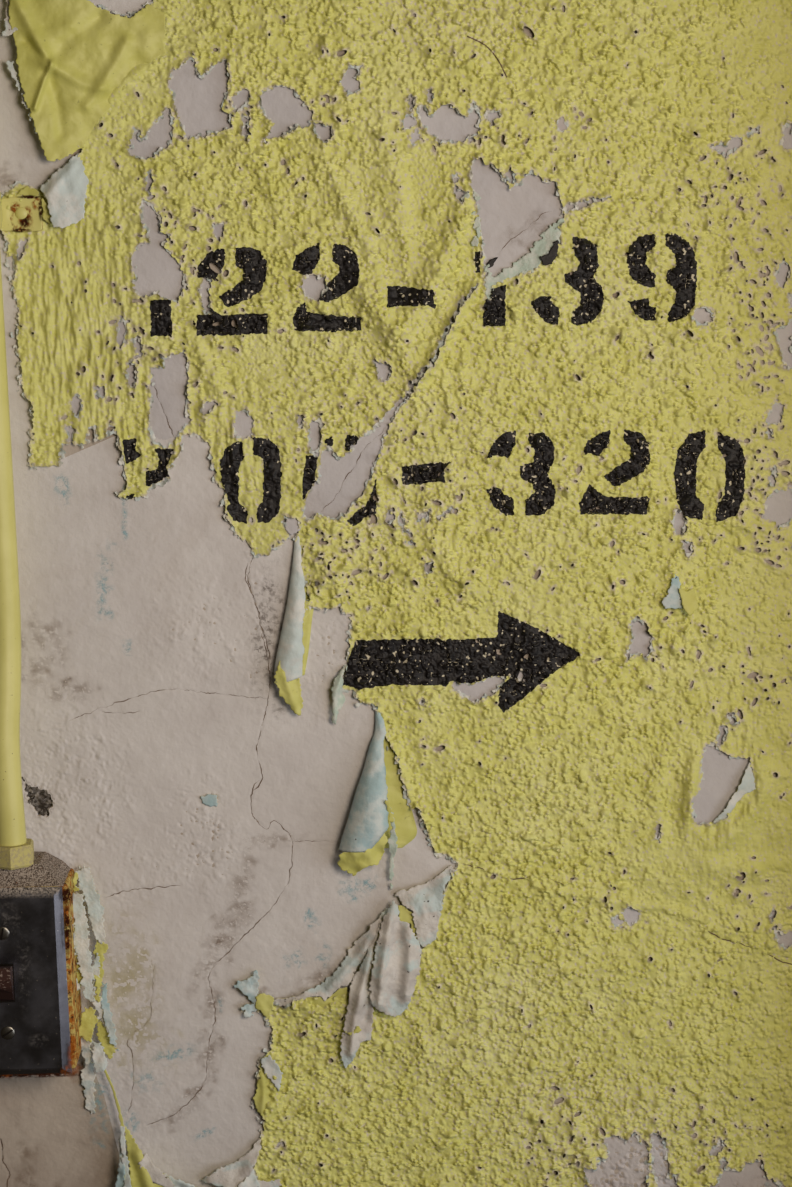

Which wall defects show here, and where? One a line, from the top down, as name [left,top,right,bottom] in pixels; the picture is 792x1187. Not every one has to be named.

peeling [0,0,167,228]
peeling [340,64,363,96]
peeling [401,88,502,146]
rust [11,195,42,232]
peeling [128,53,334,317]
peeling [0,157,611,1187]
peeling [691,712,756,825]
crack [74,556,337,1125]
peeling [584,1131,679,1187]
peeling [709,1137,785,1187]